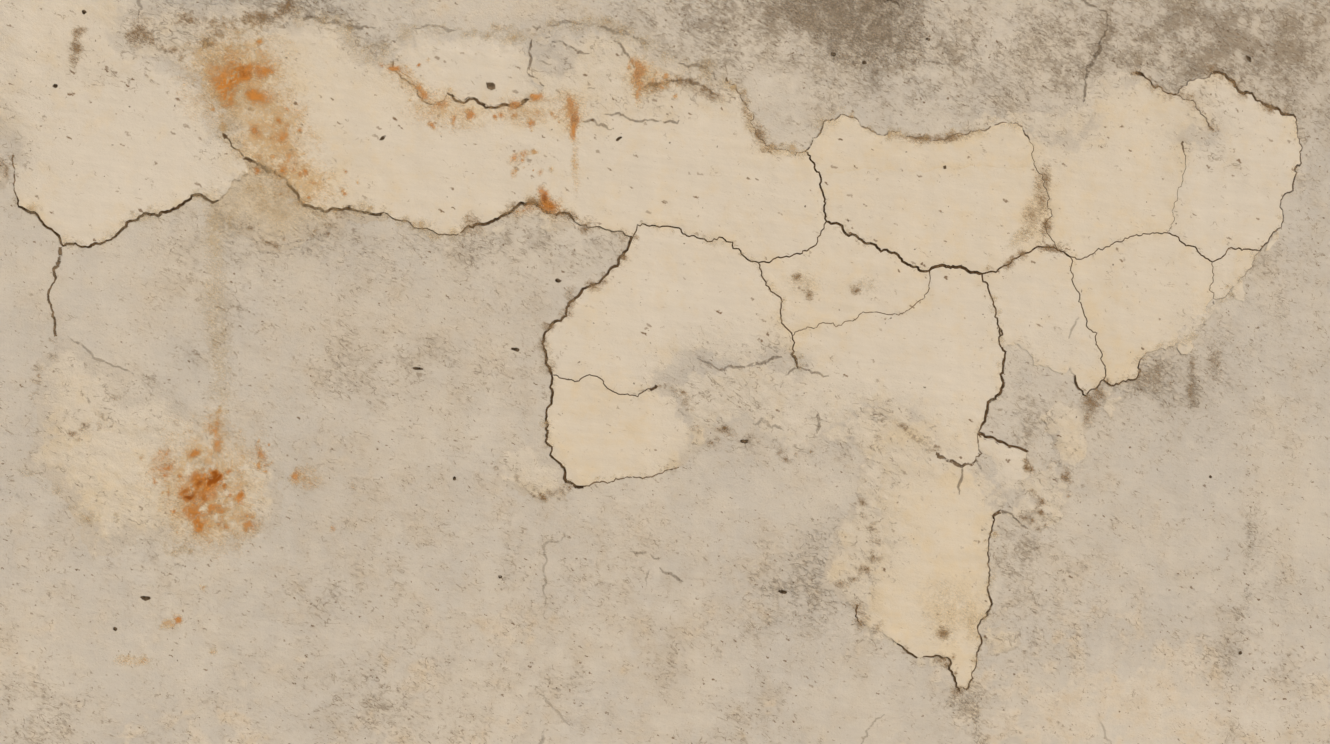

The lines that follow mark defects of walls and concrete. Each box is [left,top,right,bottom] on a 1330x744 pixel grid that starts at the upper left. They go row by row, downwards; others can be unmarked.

crack [12,155,219,337]
rust [193,39,345,203]
crack [219,124,591,236]
rust [415,85,474,128]
crack [392,61,529,109]
rust [493,93,579,169]
rust [539,189,556,213]
peeling [0,0,1302,559]
crack [541,68,1303,489]
rust [154,421,254,538]
peeling [819,406,1002,691]
crack [855,510,1001,693]